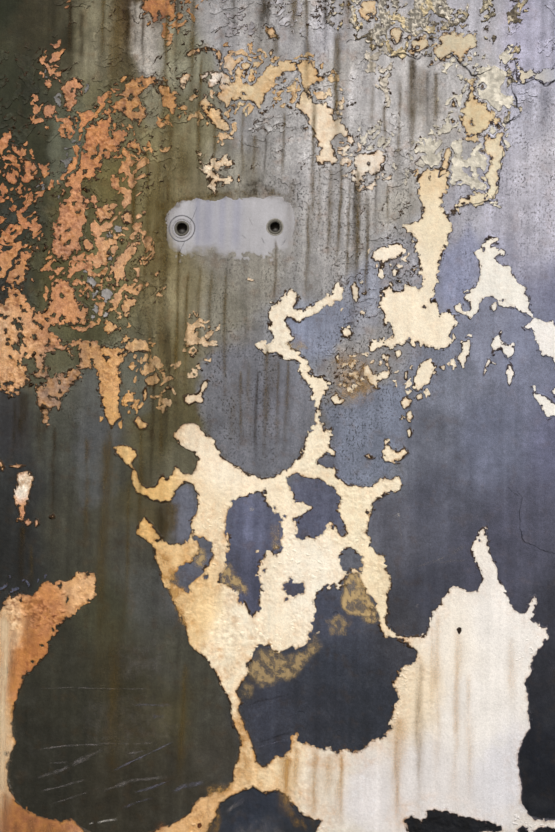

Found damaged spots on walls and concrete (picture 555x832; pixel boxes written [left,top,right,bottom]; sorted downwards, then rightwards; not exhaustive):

peeling [0,0,555,430]
damp [328,175,368,258]
spalling [0,458,57,528]
peeling [0,571,97,832]
corrosion [222,568,246,591]
peeling [113,282,555,832]